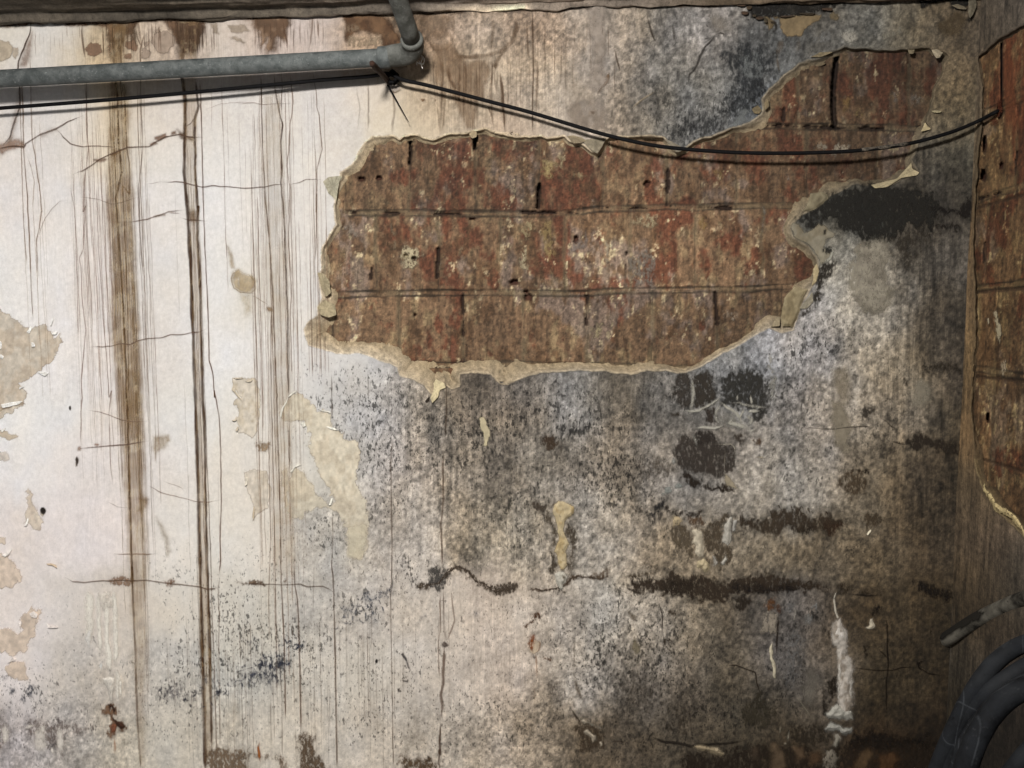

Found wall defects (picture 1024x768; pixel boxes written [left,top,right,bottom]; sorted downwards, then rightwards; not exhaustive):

crack [173,179,306,189]
spalling [302,2,951,403]
water stain [799,180,972,267]
water stain [801,261,836,316]
peeling [0,310,63,461]
crack [99,332,197,347]
peeling [245,390,369,559]
peeling [0,607,58,680]
water stain [428,566,450,591]
crack [415,464,608,762]
water stain [531,501,578,593]
water stain [627,368,933,768]